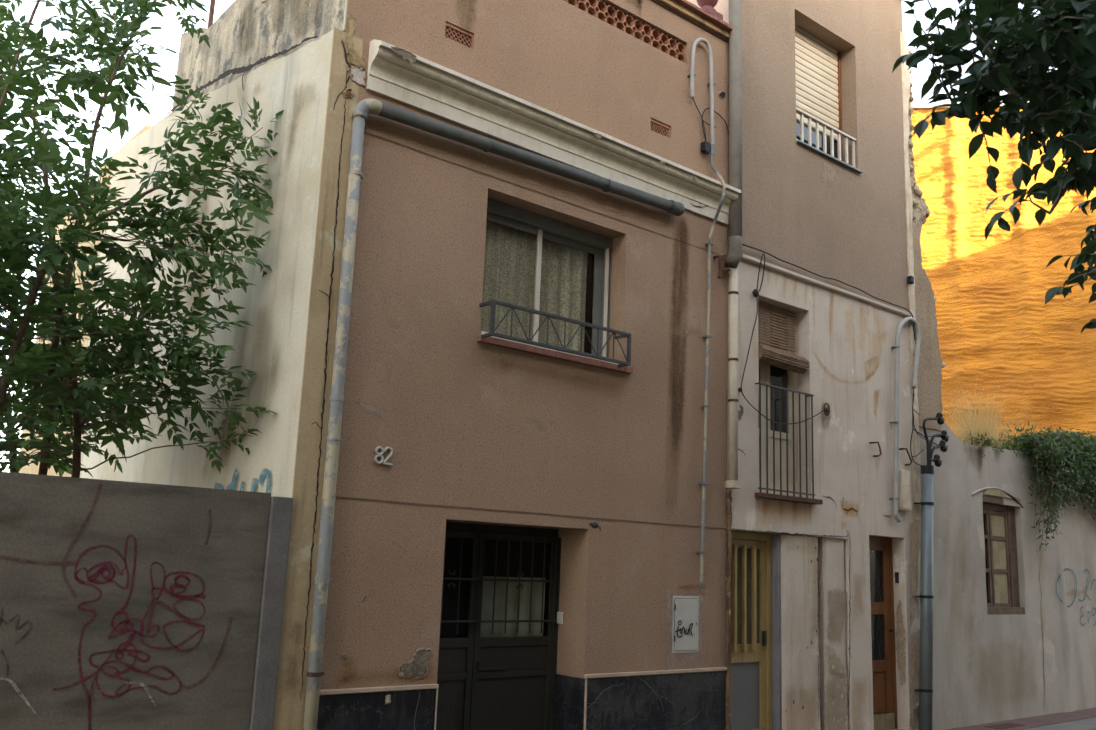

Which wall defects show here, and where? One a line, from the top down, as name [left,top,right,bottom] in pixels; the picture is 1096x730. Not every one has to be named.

crack [167,36,365,699]
spalling [398,647,432,681]